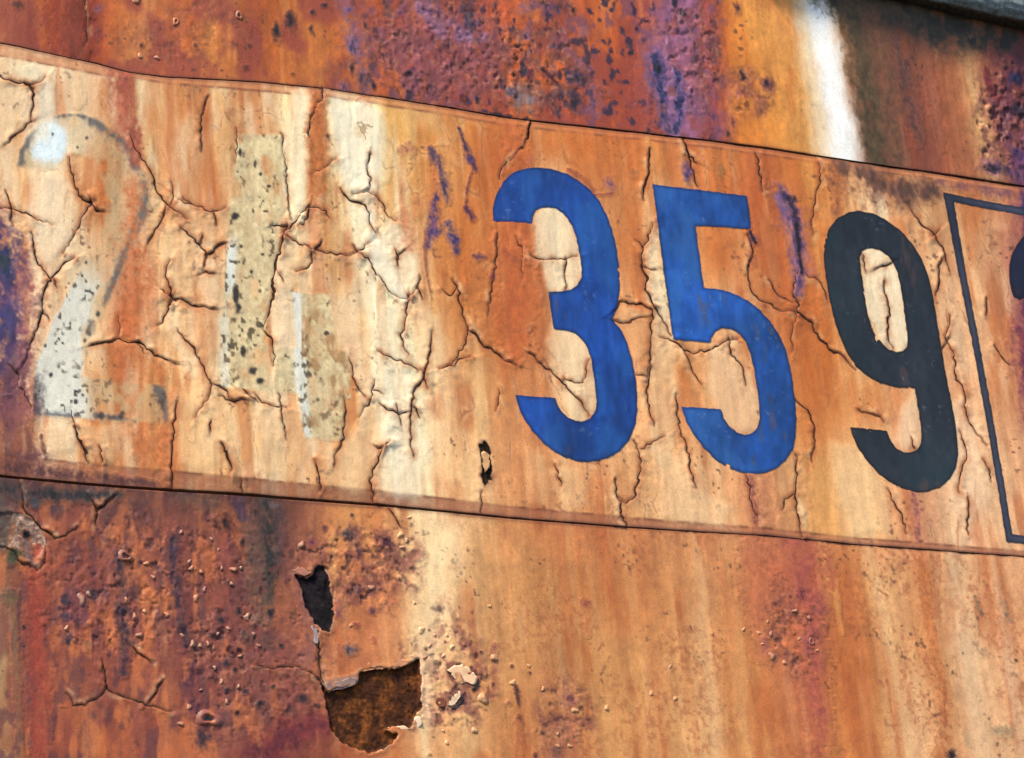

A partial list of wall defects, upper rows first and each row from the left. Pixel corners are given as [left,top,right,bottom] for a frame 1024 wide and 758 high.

corrosion [268,0,779,224]
peeling [3,513,46,570]
crack [0,158,100,407]
corrosion [0,541,138,758]
crack [90,261,286,493]
corrosion [159,509,405,758]
peeling [293,565,334,644]
peeling [321,659,422,754]
crack [263,134,589,526]
corrosion [388,124,548,371]
peeling [479,441,492,485]
crack [615,224,746,525]